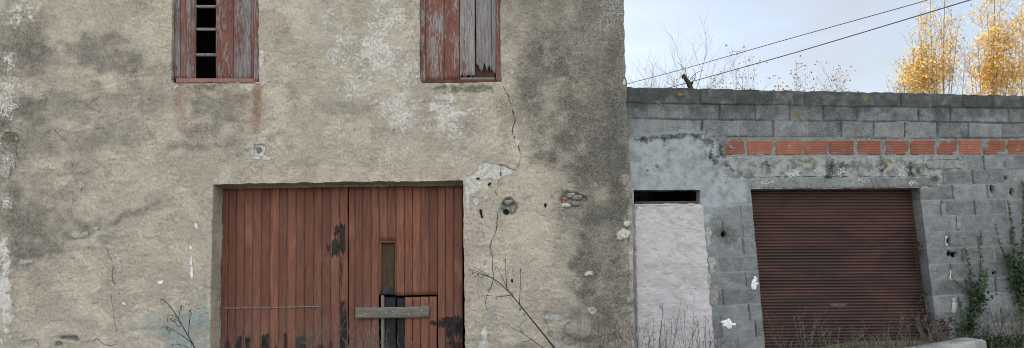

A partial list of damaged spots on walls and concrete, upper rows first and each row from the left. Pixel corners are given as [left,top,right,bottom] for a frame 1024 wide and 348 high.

leakage [312,0,487,152]
spalling [465,162,515,238]
crack [485,87,520,309]
leakage [524,0,733,324]